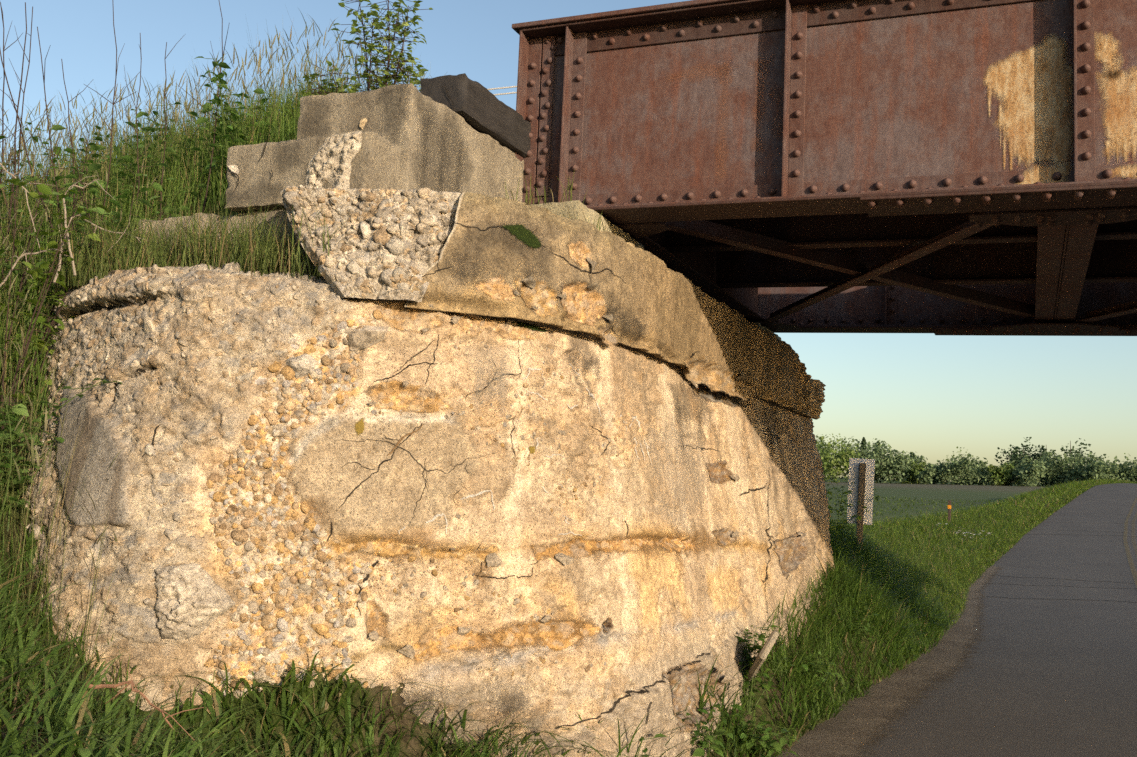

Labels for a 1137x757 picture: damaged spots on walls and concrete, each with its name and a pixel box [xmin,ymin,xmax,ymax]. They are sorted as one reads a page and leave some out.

corrosion [984,35,1073,184]
corrosion [1095,33,1137,178]
spalling [280,118,537,351]
spalling [475,242,618,346]
crack [327,335,532,542]
crack [556,653,711,729]